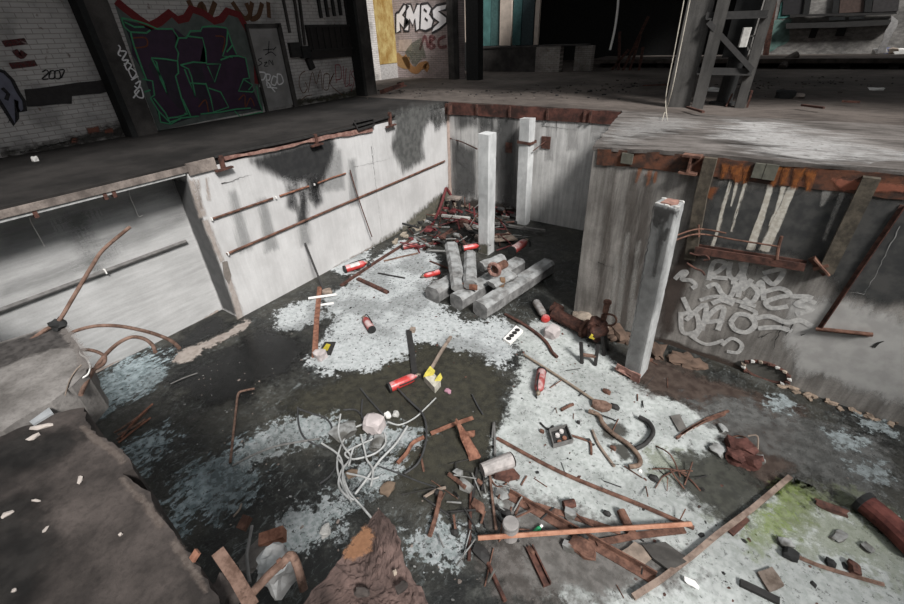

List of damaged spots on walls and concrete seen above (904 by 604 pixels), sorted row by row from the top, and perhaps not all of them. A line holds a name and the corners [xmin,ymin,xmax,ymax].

leakage [232,194,249,249]
leakage [255,139,357,249]
leakage [335,104,518,267]
corrosion [708,163,750,200]
leakage [699,180,852,262]
corrosion [770,166,817,191]
corrosion [875,183,904,192]
leakage [0,326,177,419]
leakage [120,432,278,592]